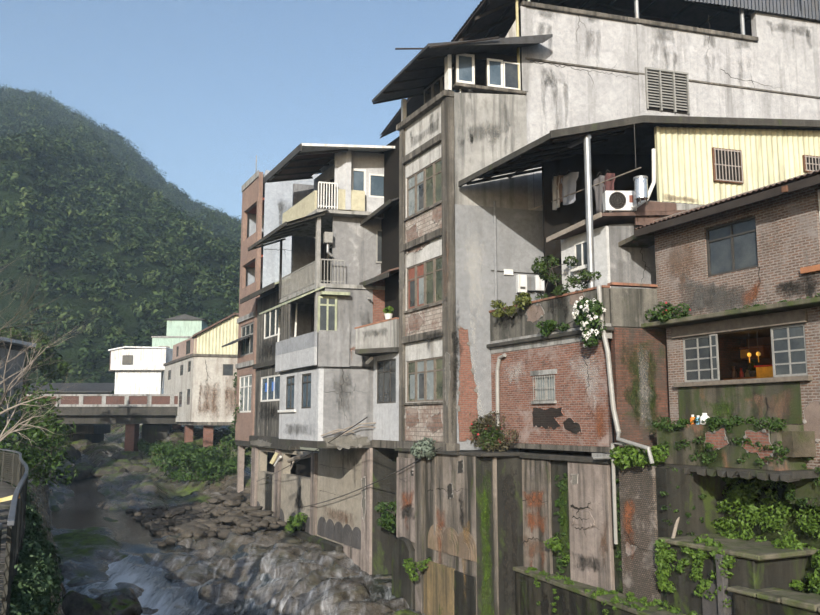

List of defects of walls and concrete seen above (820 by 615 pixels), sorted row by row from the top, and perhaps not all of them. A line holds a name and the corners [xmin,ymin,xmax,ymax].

crack [703,15,780,88]
peeling [399,223,430,290]
flaking render [525,303,545,323]
flaking render [404,325,478,442]
spalling [532,407,582,435]
spalling [704,428,729,452]
spalling [742,429,774,465]
flaking render [802,400,820,445]
crack [570,502,598,530]